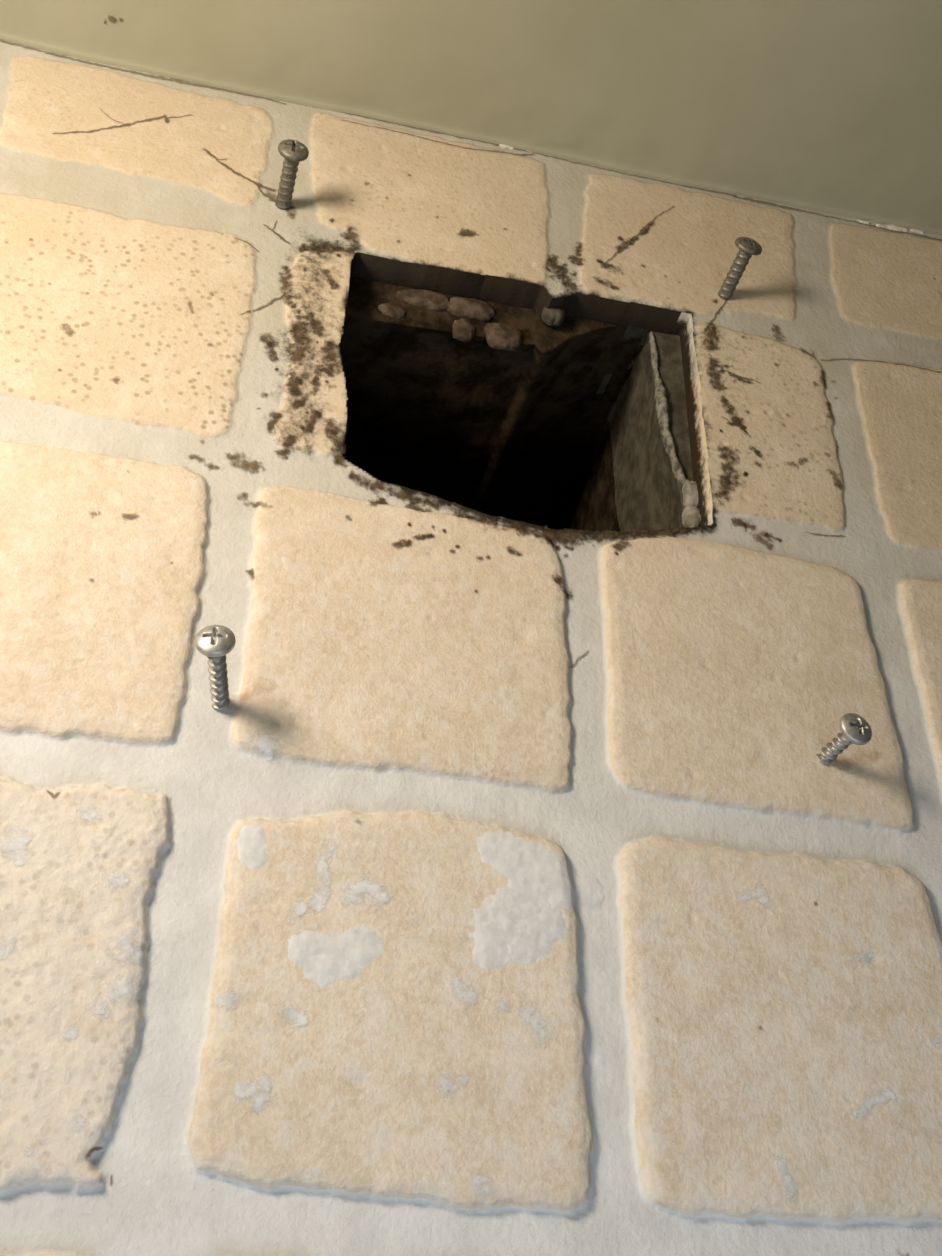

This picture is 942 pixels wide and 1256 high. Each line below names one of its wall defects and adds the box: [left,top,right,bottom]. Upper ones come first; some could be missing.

spalling [287,841,391,989]
spalling [469,829,606,969]